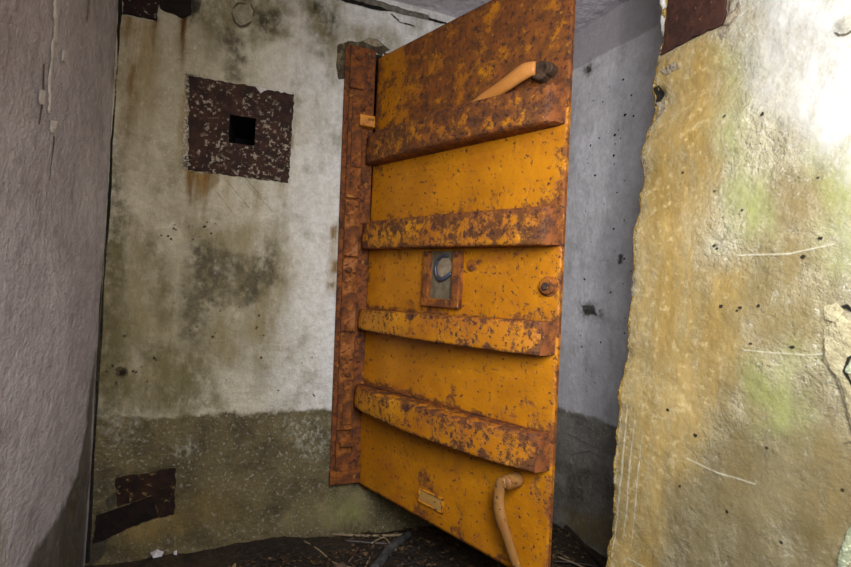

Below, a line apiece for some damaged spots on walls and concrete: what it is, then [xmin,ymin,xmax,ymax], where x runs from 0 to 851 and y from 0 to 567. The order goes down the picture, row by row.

leakage [191,0,283,51]
leakage [307,1,336,37]
leakage [185,227,284,342]
flaking render [823,303,851,431]
crack [843,356,851,384]
flaking render [836,527,851,567]